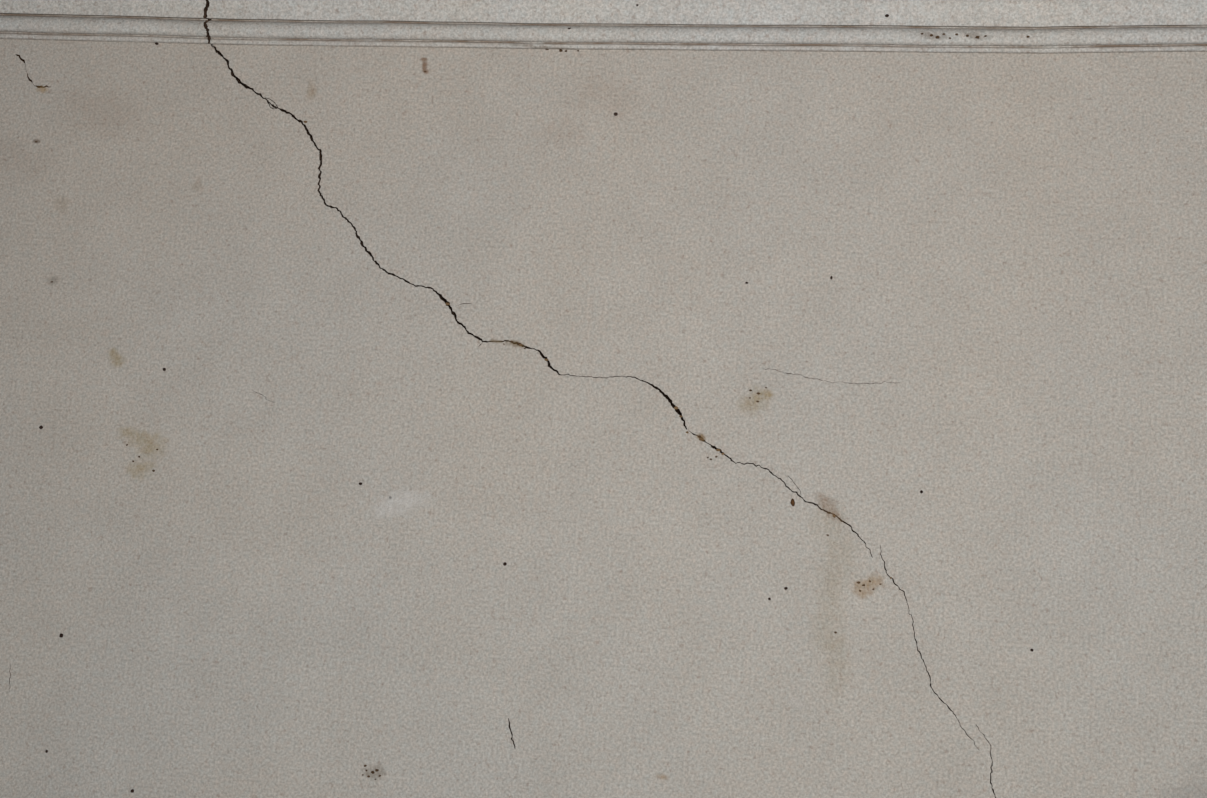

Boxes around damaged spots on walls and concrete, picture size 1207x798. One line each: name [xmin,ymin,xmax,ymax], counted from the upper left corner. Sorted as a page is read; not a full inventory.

crack [203,0,996,798]